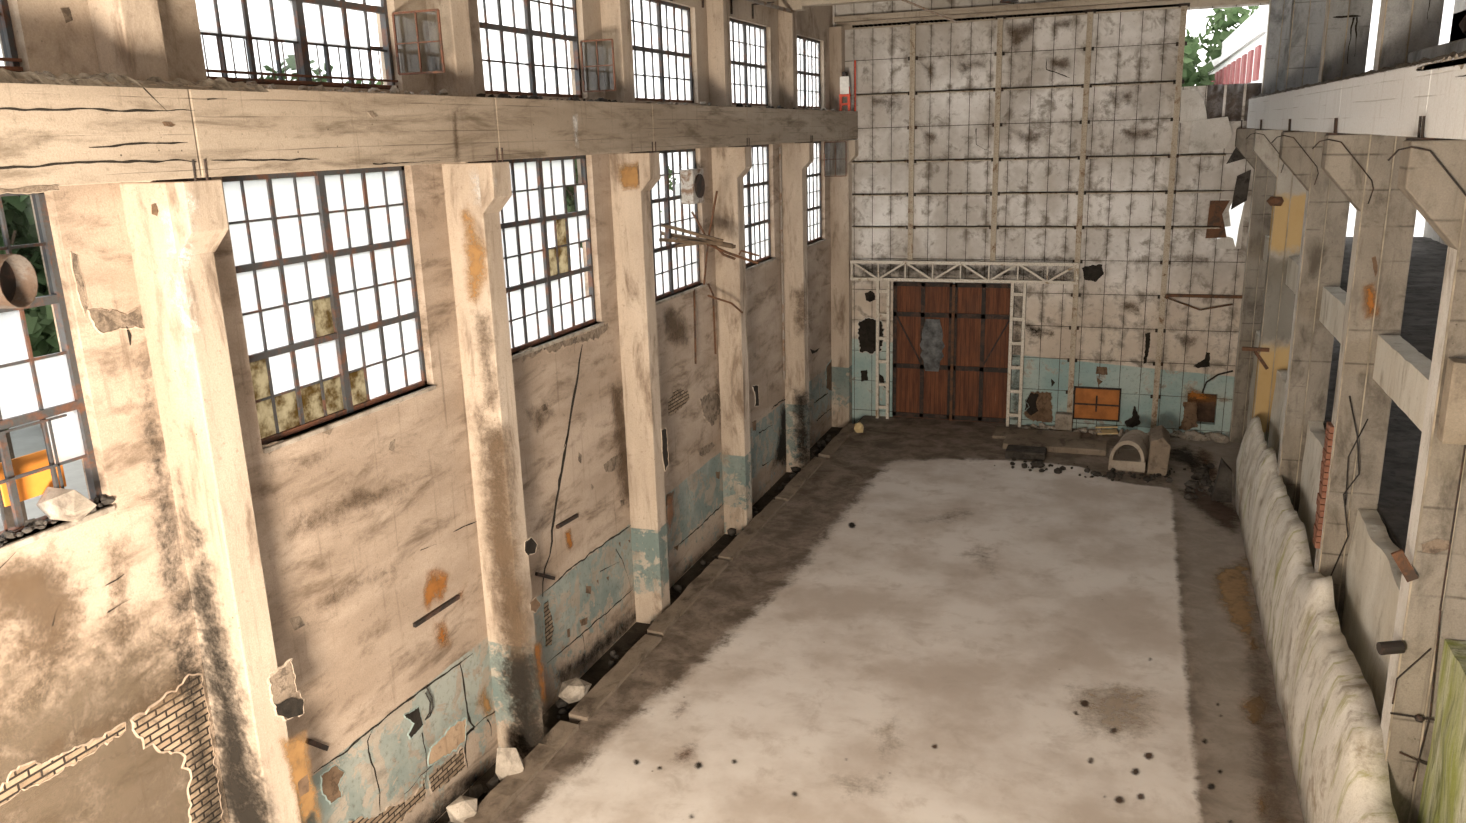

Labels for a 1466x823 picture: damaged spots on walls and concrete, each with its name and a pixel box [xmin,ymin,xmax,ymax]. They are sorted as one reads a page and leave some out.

rust [463,211,486,298]
damp [612,386,630,506]
damp [159,496,188,611]
damp [482,430,529,666]
damp [0,561,79,655]
flaking render [0,672,226,823]
damp [178,643,224,823]
spalling [267,658,305,721]
peeling [298,764,345,805]
flaking render [346,717,467,823]
spalling [403,706,424,739]